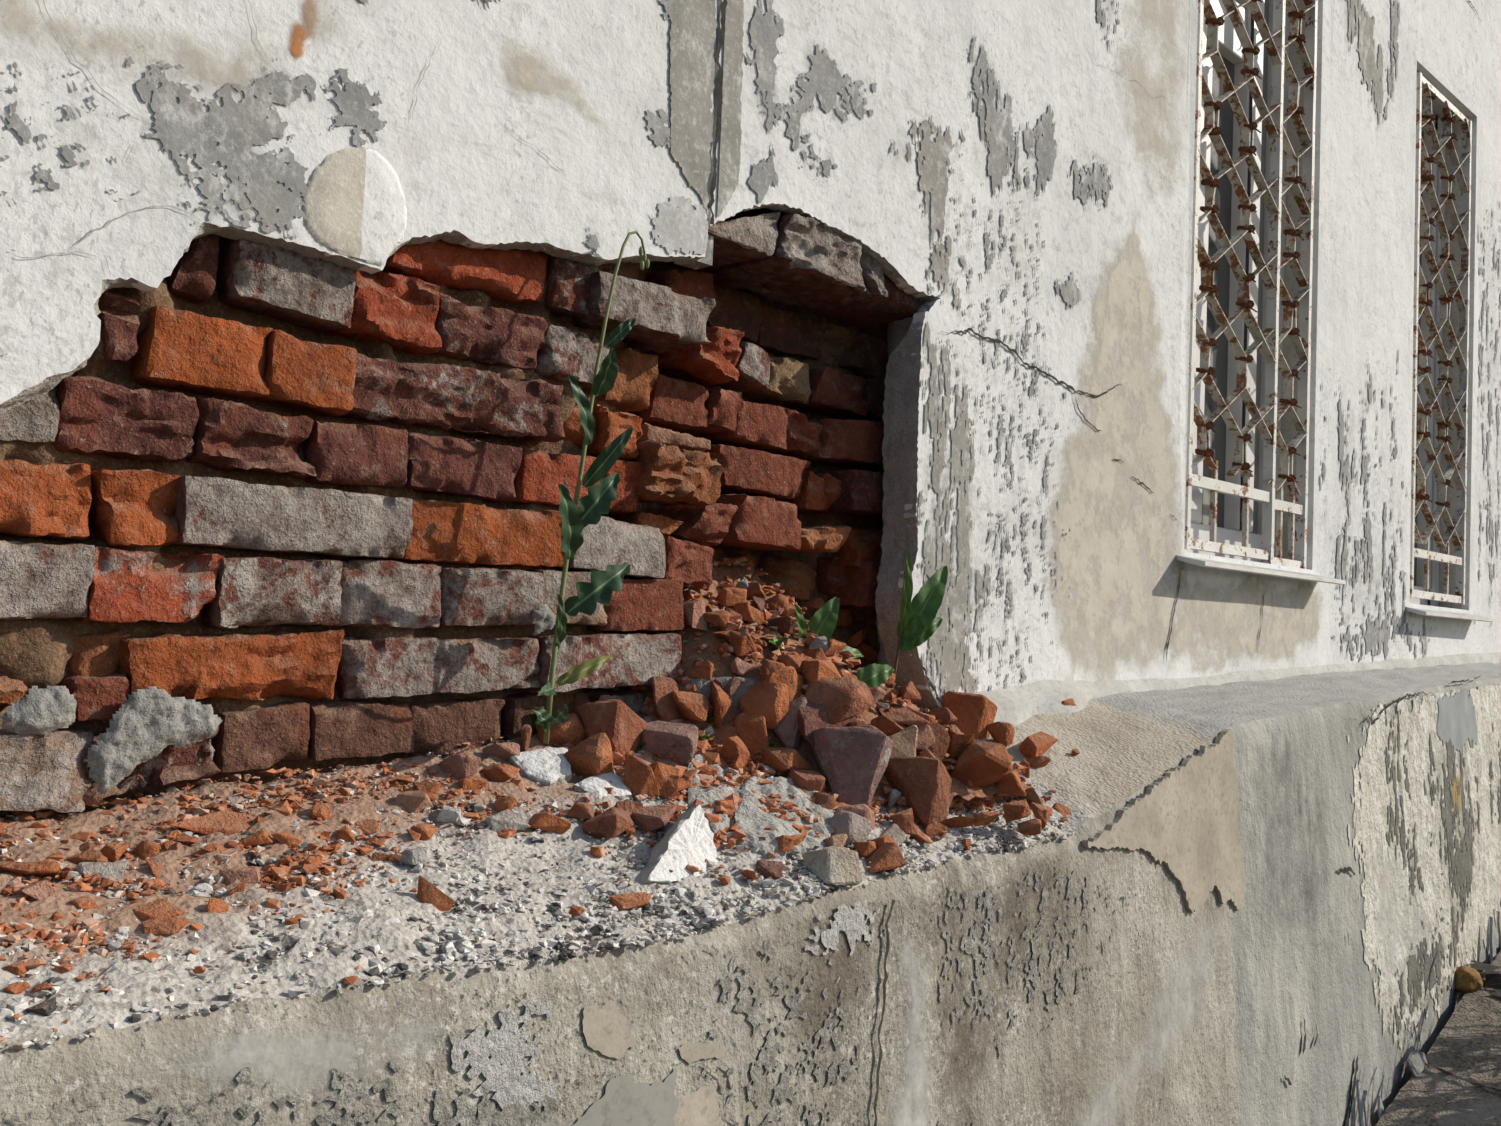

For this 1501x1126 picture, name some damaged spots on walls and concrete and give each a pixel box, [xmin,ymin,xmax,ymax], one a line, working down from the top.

crack [708,0,728,225]
peeling [0,0,1246,1066]
crack [938,328,1177,520]
crack [1166,561,1183,662]
damp [1051,234,1319,678]
peeling [1474,210,1501,627]
peeling [1348,683,1501,1074]
crack [717,1067,731,1090]
spalling [674,897,890,1126]
crack [873,900,895,1126]